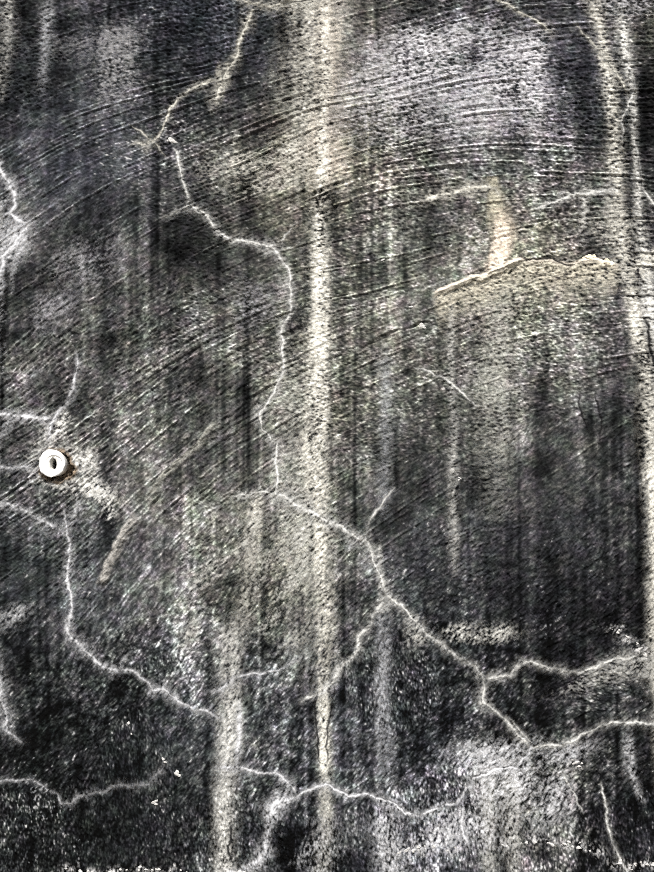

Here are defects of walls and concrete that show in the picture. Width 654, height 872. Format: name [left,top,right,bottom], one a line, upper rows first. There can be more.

leakage [360,28,551,133]
crack [0,162,29,290]
leakage [488,176,511,276]
crack [0,360,79,439]
leakage [253,0,344,790]
crack [137,0,654,872]
leakage [590,0,654,690]
crack [0,498,214,716]
leakage [446,624,510,640]
crack [0,678,10,734]
leakage [215,622,246,872]
leakage [378,743,600,872]